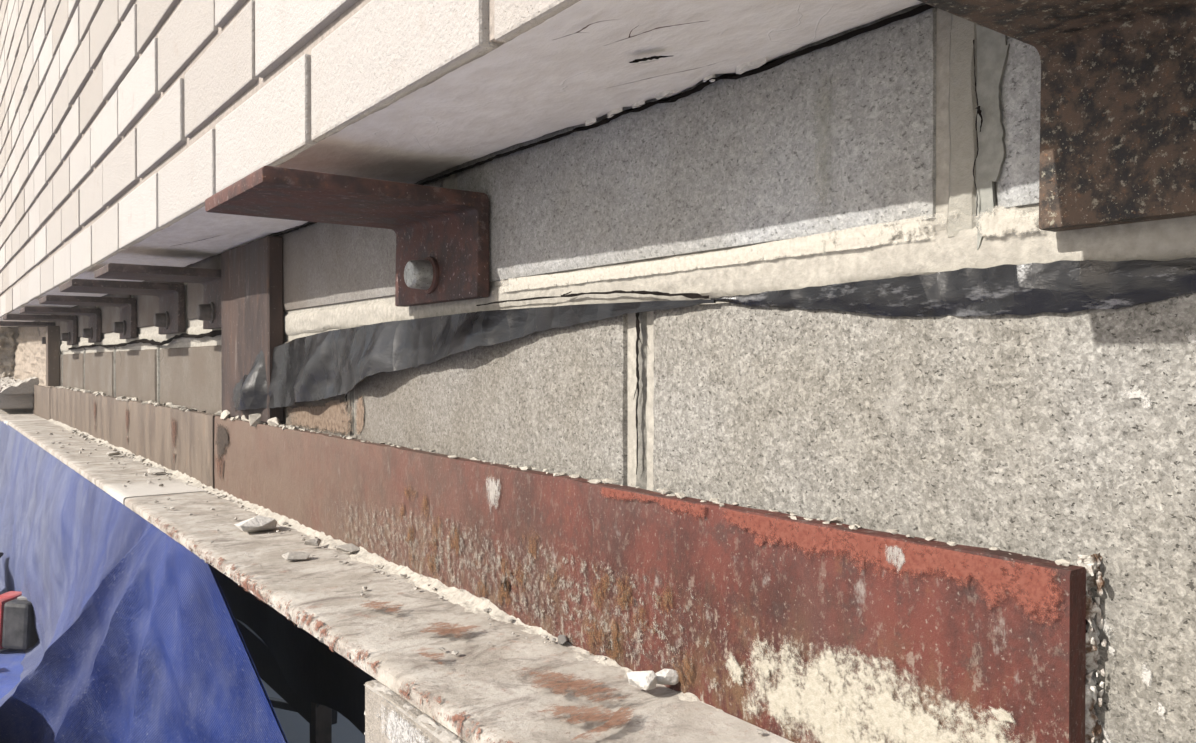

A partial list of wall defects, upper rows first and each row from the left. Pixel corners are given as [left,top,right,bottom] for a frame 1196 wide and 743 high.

crack [418,4,934,185]
crack [973,39,983,216]
crack [274,222,317,236]
rust [148,516,379,673]
rust [362,600,404,613]
rust [420,622,477,638]
water stain [337,500,728,677]
rust [399,682,519,743]
rust [522,667,635,741]
water stain [710,641,1018,743]